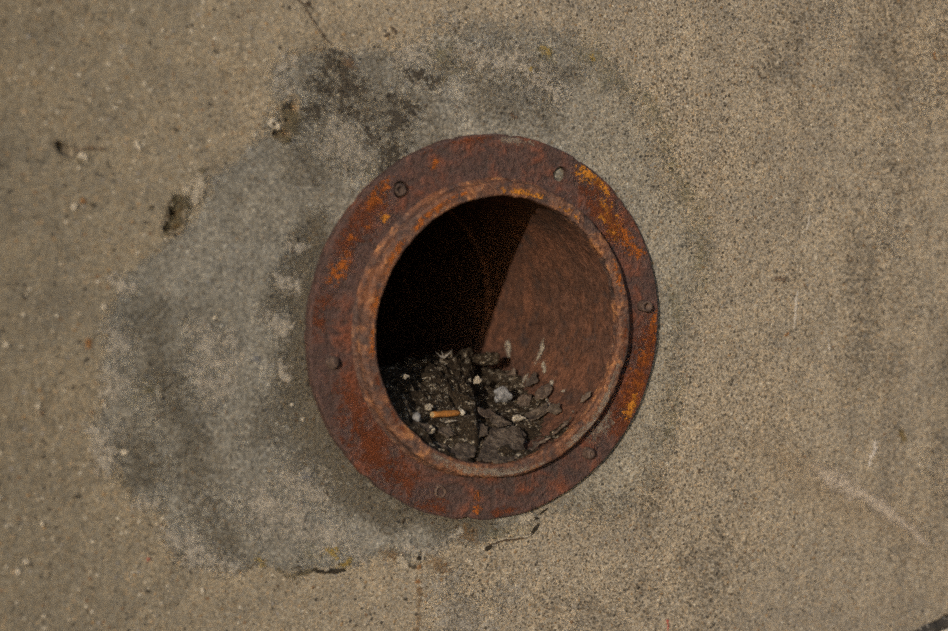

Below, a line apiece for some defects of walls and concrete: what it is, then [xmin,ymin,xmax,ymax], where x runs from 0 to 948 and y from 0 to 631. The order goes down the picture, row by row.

leakage [267,38,582,199]
rust [326,176,392,287]
rust [575,164,647,260]
rust [367,291,381,356]
rust [462,407,497,438]
rust [434,456,543,476]
rust [517,383,591,447]
rust [568,311,657,447]